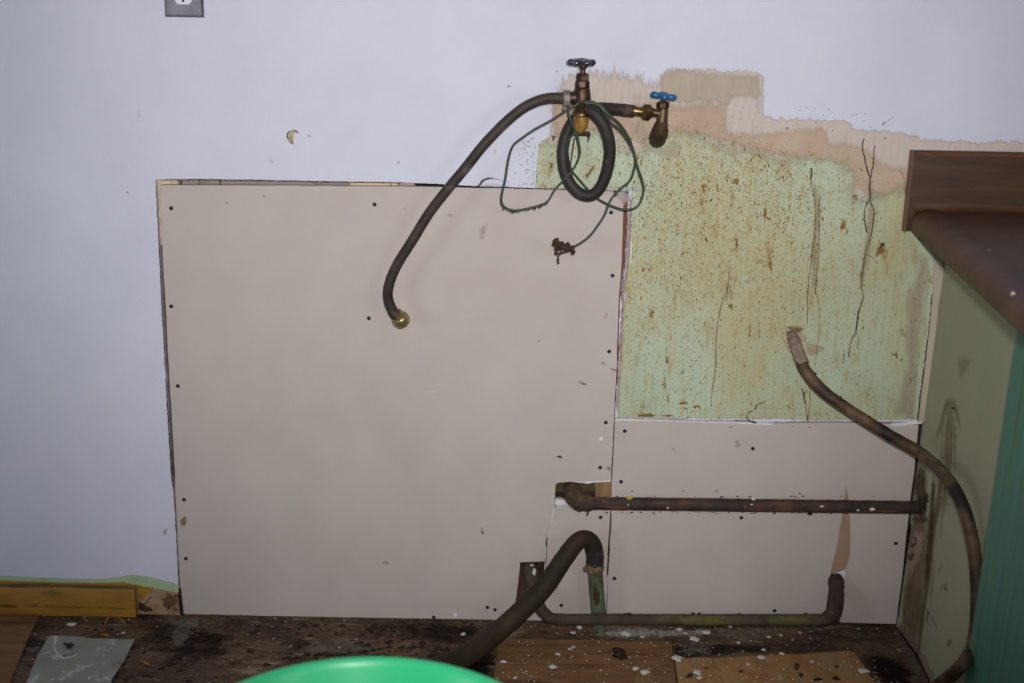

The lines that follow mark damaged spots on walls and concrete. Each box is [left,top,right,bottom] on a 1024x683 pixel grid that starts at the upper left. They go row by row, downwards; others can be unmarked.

corrosion [509,123,565,190]
corrosion [569,115,933,427]
peeling [535,67,1024,445]
crack [843,139,877,364]
spalling [537,492,568,578]
spalling [577,480,611,497]
spalling [910,458,918,501]
water stain [903,466,941,648]